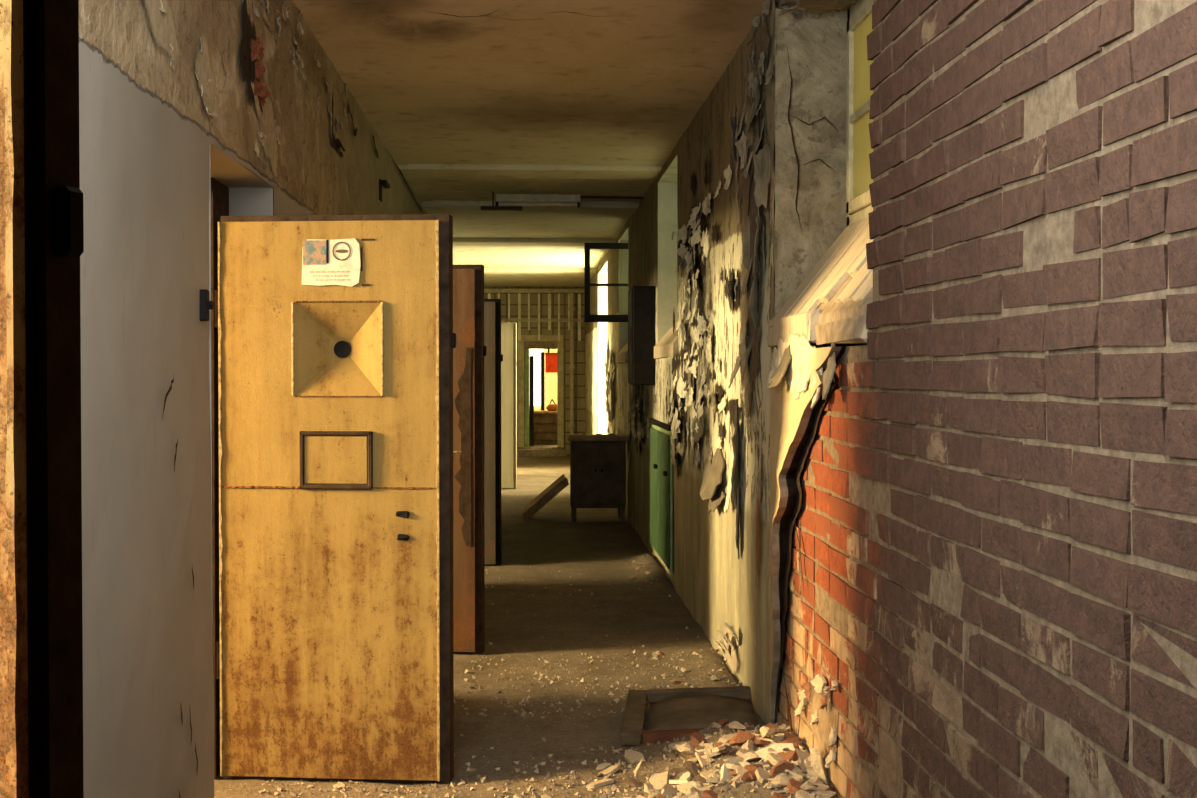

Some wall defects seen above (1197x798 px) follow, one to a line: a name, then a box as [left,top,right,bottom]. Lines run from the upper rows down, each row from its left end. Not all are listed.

spalling [240,0,351,186]
crack [748,43,838,307]
flaking render [666,0,855,559]
peeling [604,340,649,466]
spalling [794,675,838,768]